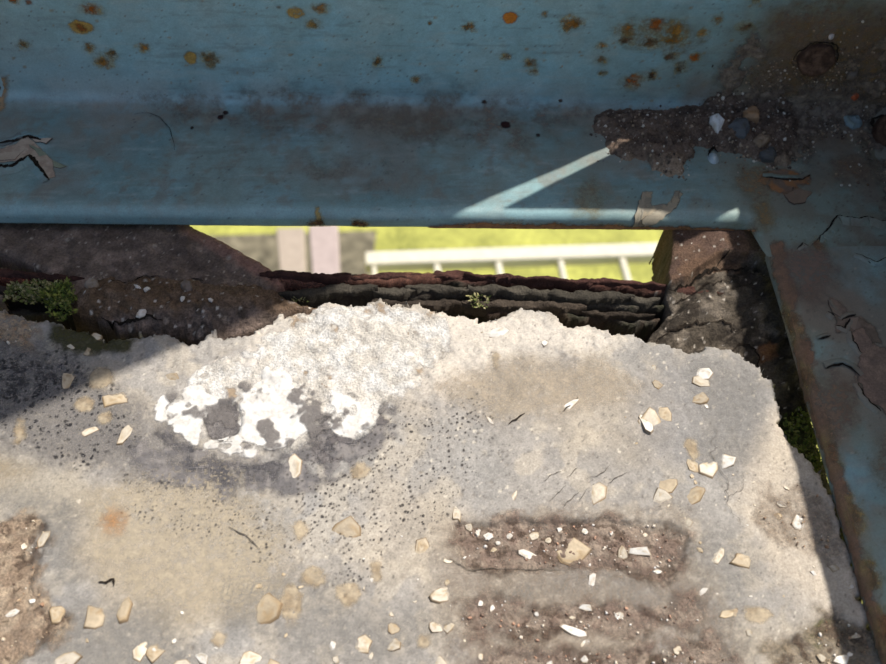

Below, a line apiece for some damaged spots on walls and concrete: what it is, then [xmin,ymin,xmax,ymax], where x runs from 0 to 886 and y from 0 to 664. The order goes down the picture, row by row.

corrosion [69,6,101,51]
corrosion [278,7,316,28]
corrosion [503,12,518,24]
corrosion [621,19,699,71]
crack [0,71,8,111]
peeling [0,132,67,183]
peeling [631,191,683,227]
peeling [825,298,886,415]
corrosion [769,241,886,664]
damp [0,339,629,626]
damp [443,545,727,664]
damp [36,613,176,664]